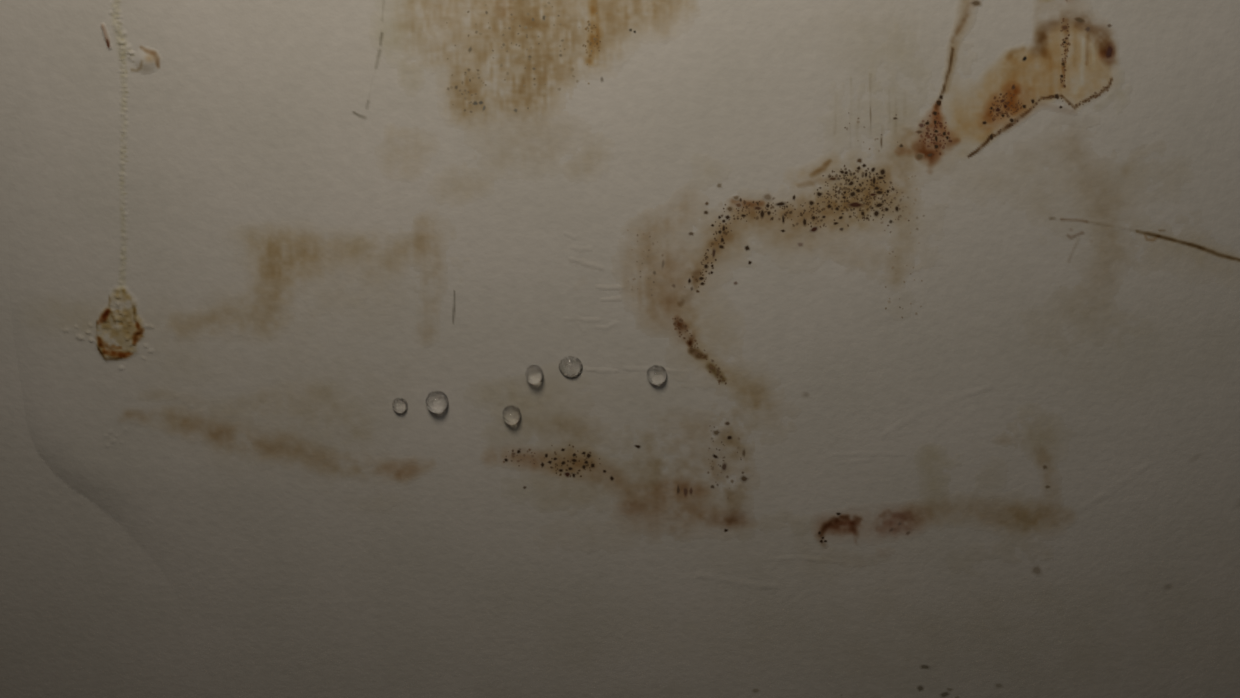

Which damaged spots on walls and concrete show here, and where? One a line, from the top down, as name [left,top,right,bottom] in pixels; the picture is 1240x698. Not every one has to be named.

peeling [100,22,113,51]
peeling [128,44,163,74]
damp [116,0,702,513]
crack [1049,217,1240,264]
spalling [62,285,155,370]
damp [463,24,1240,581]